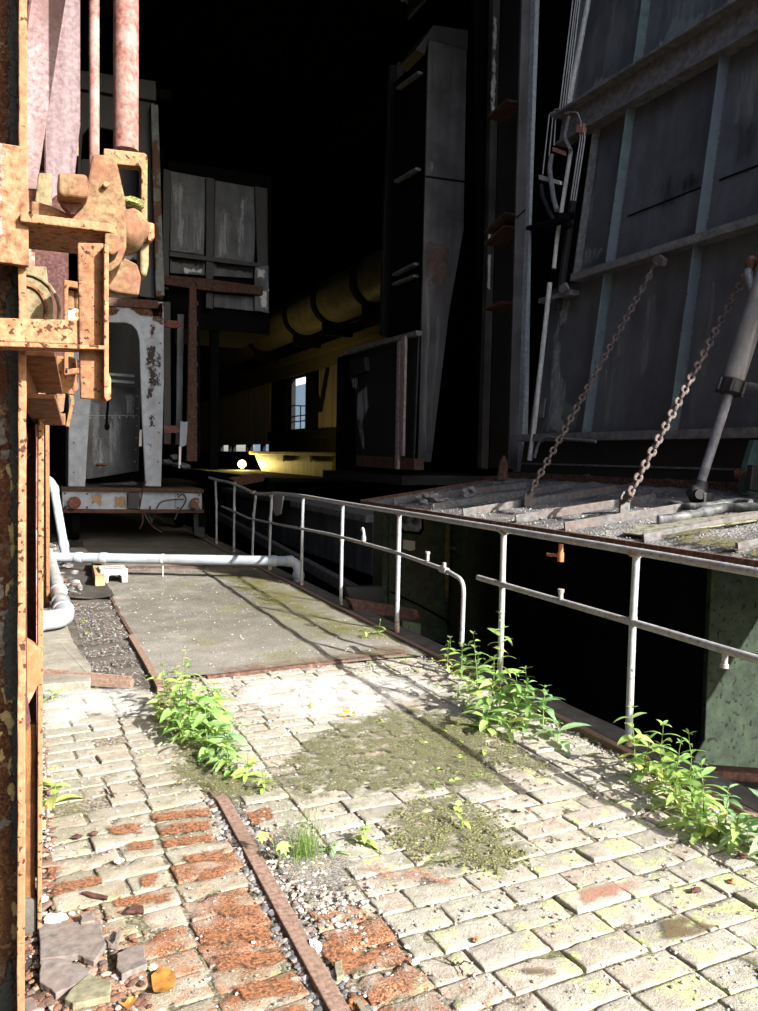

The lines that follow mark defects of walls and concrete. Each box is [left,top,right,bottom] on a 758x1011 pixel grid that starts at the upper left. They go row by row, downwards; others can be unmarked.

rust [109,302,165,325]
peeling [0,577,18,656]